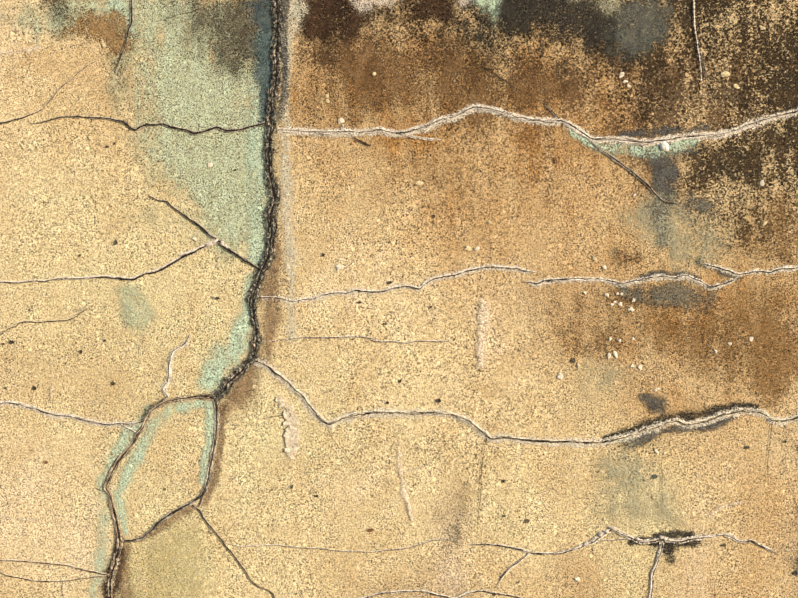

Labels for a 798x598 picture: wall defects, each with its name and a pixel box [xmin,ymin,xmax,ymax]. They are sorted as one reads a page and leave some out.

damp [13,0,276,265]
rust [296,15,590,137]
crack [277,100,798,204]
crack [692,0,707,81]
crack [0,0,537,598]
damp [197,0,798,505]
crack [523,262,798,290]
rust [554,187,798,410]
damp [90,397,215,598]
crack [252,358,798,507]
crack [360,526,798,598]
damp [599,391,760,565]